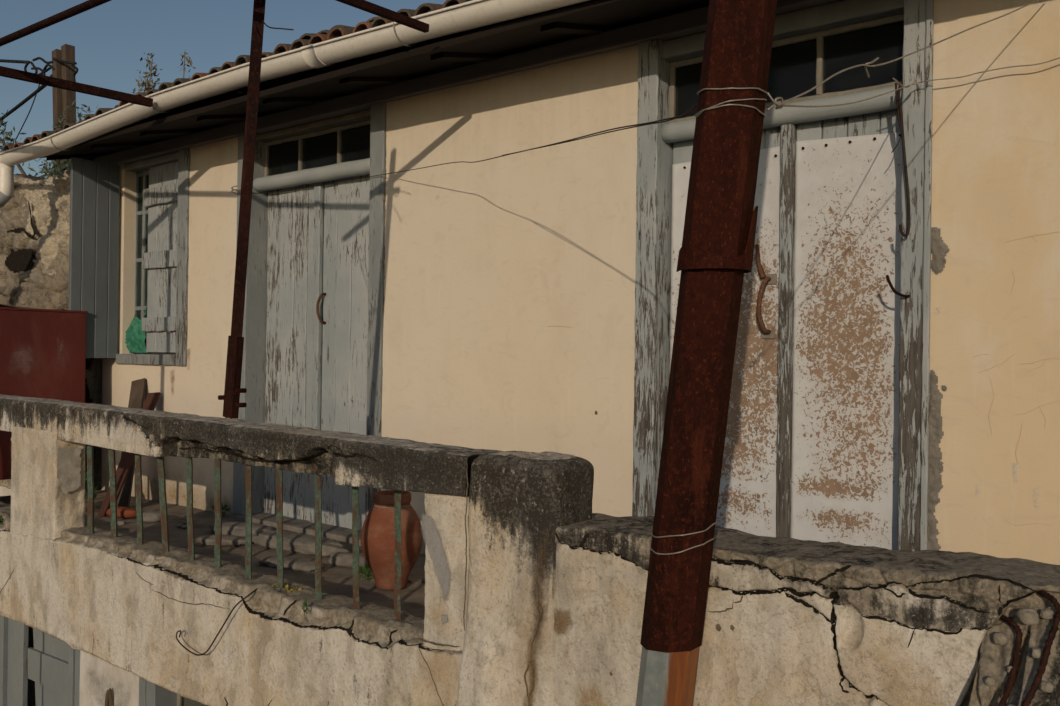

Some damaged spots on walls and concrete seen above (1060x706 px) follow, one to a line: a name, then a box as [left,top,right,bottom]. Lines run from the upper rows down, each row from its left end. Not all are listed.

spalling [931,227,949,274]
crack [121,413,165,449]
spalling [928,370,947,550]
crack [137,574,228,609]
crack [414,459,469,705]
crack [707,558,1039,706]
spalling [985,590,1060,706]